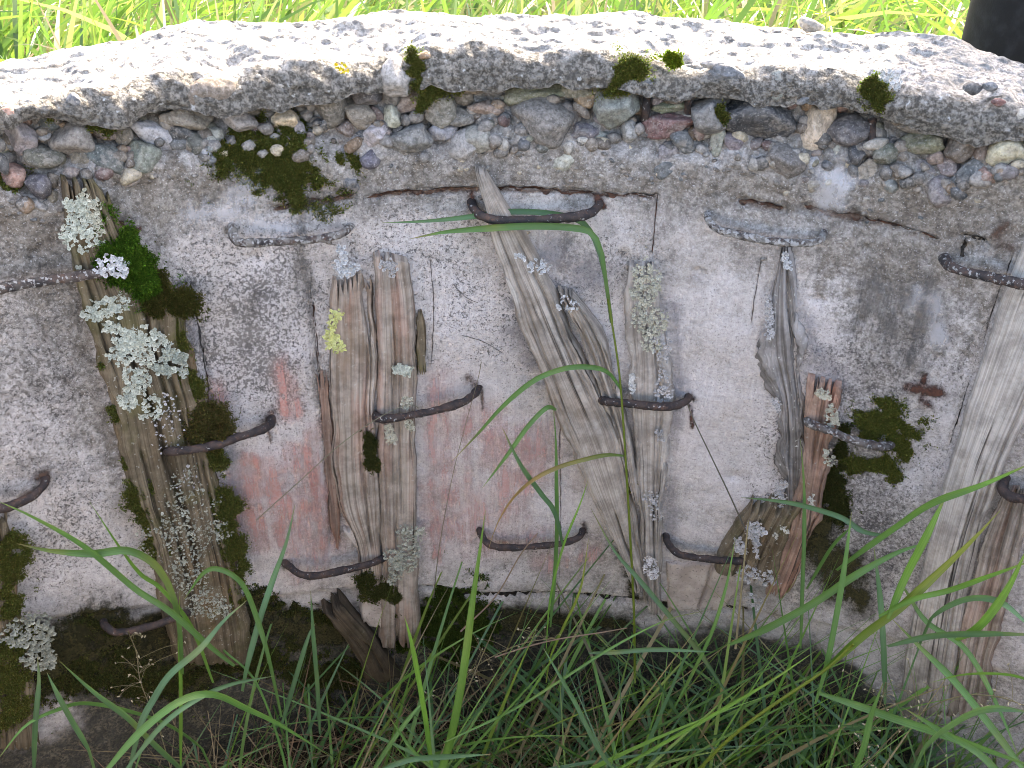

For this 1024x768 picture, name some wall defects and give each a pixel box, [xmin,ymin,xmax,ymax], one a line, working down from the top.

corrosion [385,187,479,199]
crack [196,316,210,402]
corrosion [905,373,946,408]
corrosion [23,469,50,496]